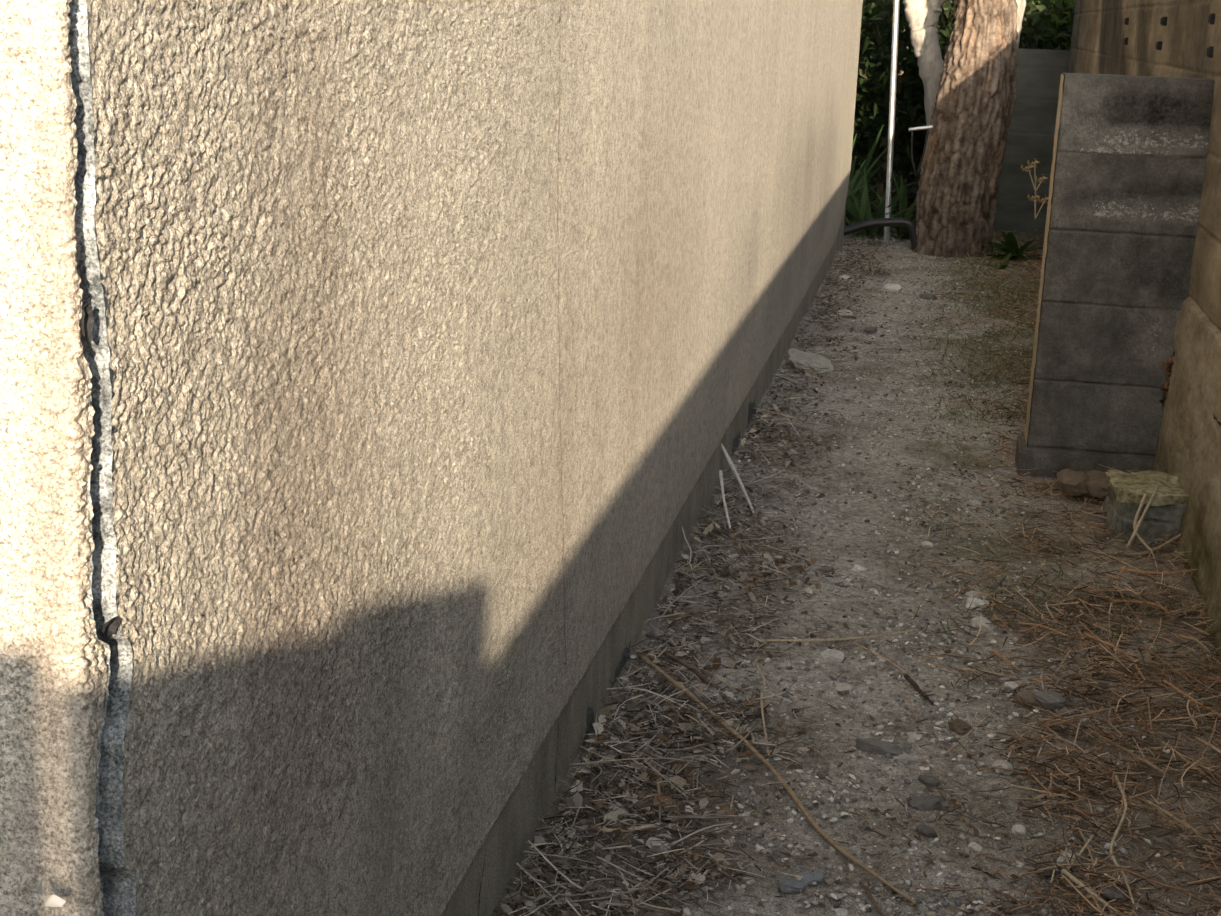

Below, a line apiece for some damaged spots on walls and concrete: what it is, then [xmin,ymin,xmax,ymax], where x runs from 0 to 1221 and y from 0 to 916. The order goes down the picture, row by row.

crack [68,0,137,916]